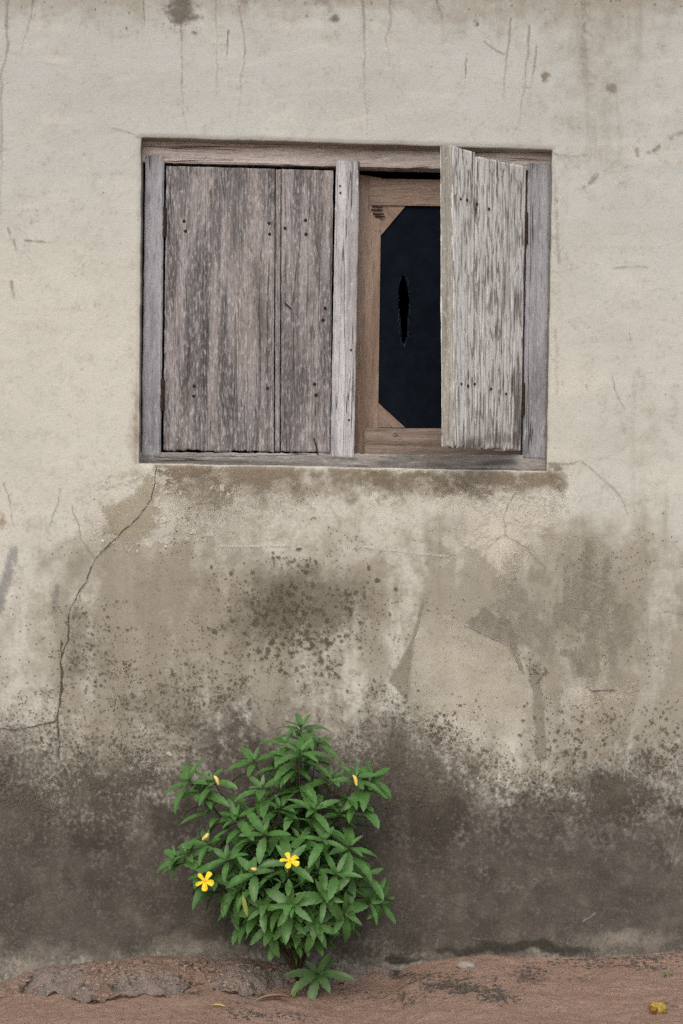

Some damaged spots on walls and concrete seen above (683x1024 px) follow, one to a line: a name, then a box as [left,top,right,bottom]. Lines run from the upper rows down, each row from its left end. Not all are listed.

damp [155,464,561,552]
crack [0,467,157,775]
damp [0,548,381,845]
damp [340,602,515,830]
damp [518,654,683,851]
damp [385,955,419,964]
damp [437,938,580,956]